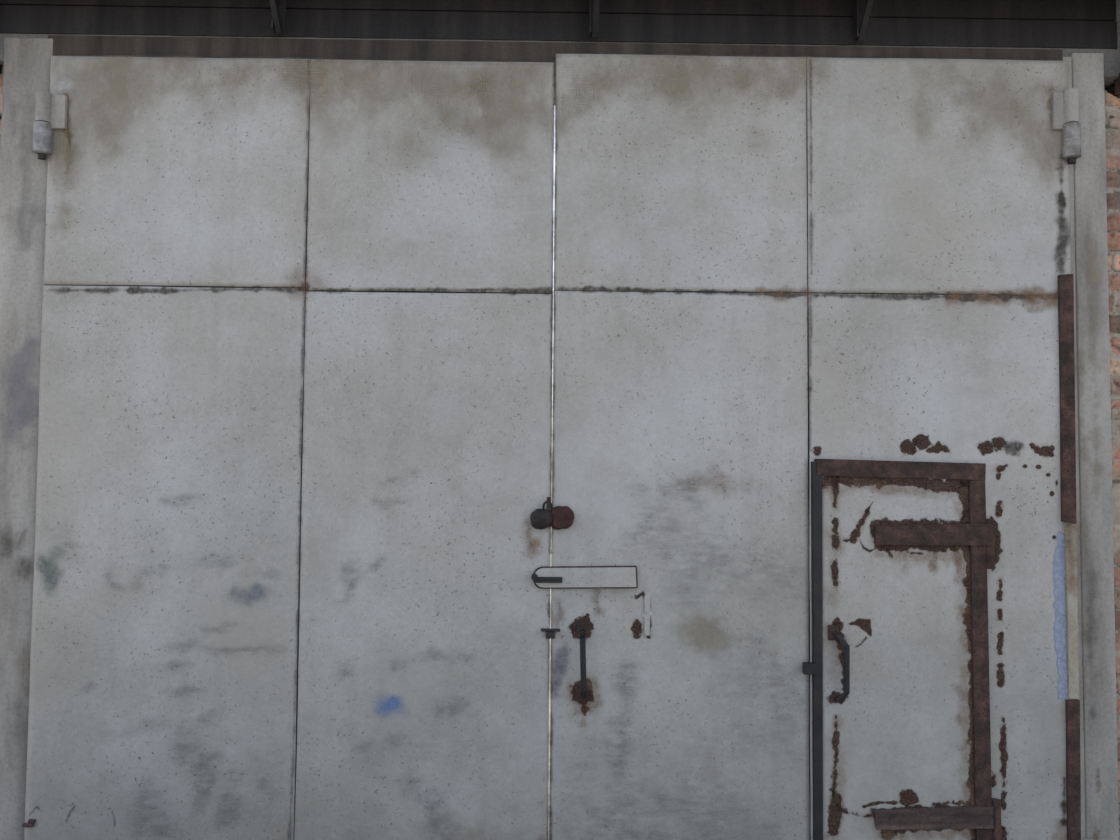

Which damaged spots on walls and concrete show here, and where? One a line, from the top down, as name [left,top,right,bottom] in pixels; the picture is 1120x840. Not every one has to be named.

leakage [91,57,141,134]
rust [870,517,970,569]
rust [569,614,594,639]
rust [552,654,594,715]
rust [831,622,848,704]
rust [862,789,975,817]
rust [881,829,976,840]